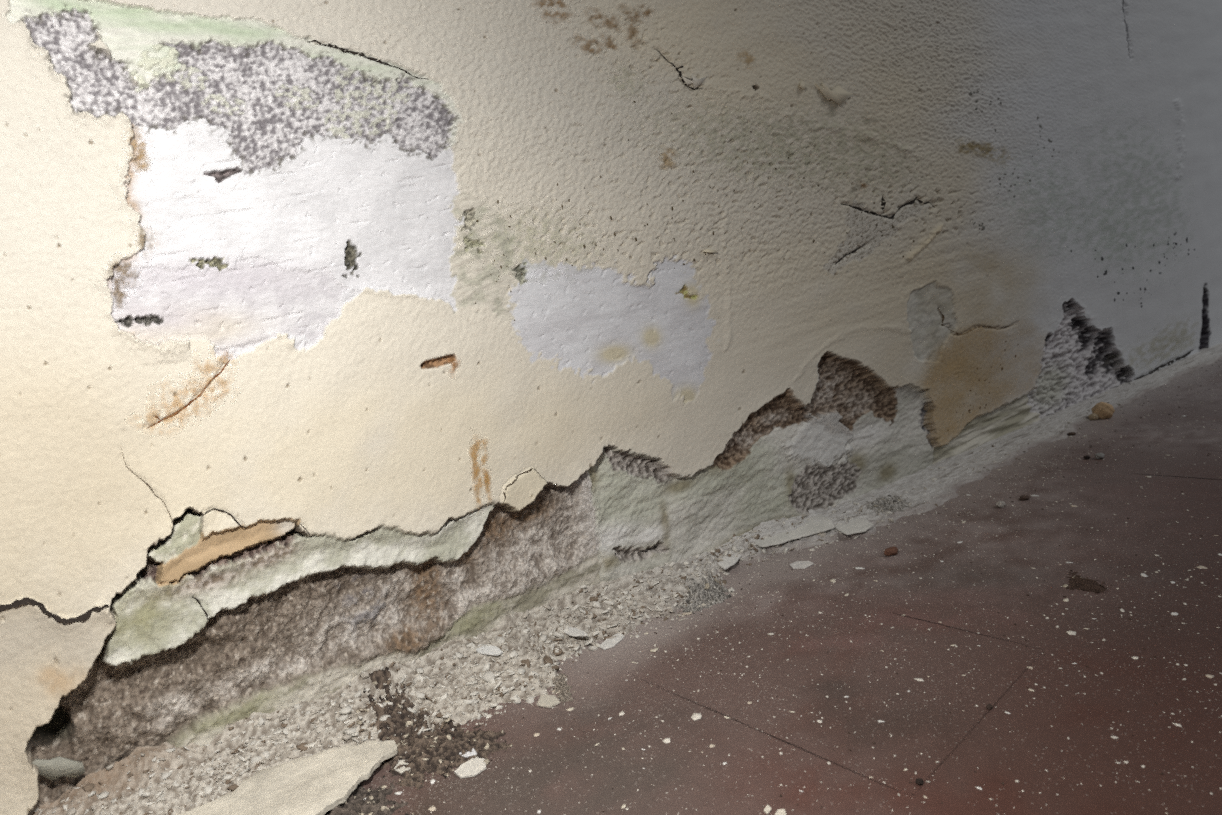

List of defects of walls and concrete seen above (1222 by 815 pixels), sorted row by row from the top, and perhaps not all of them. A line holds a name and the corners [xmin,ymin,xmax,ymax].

peeling [5,0,717,404]
peeling [907,282,958,362]
crack [147,358,231,428]
spalling [26,300,1133,805]
crack [0,597,109,624]